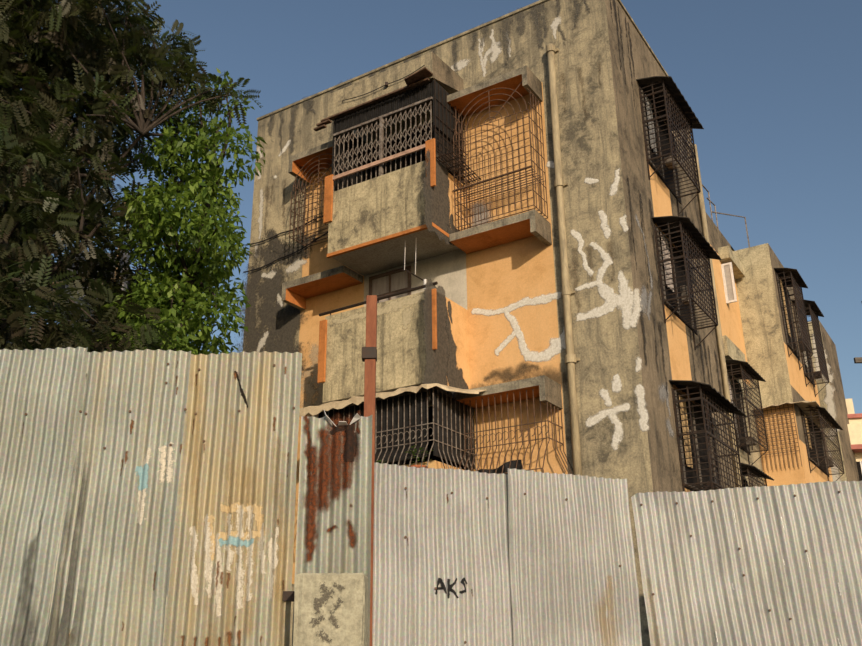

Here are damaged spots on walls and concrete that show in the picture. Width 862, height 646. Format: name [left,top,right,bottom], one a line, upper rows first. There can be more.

water stain [471,0,566,77]
water stain [573,0,590,28]
water stain [610,0,635,107]
water stain [268,99,315,153]
water stain [235,170,321,374]
water stain [627,178,674,436]
water stain [689,328,722,395]
rust [304,411,360,562]